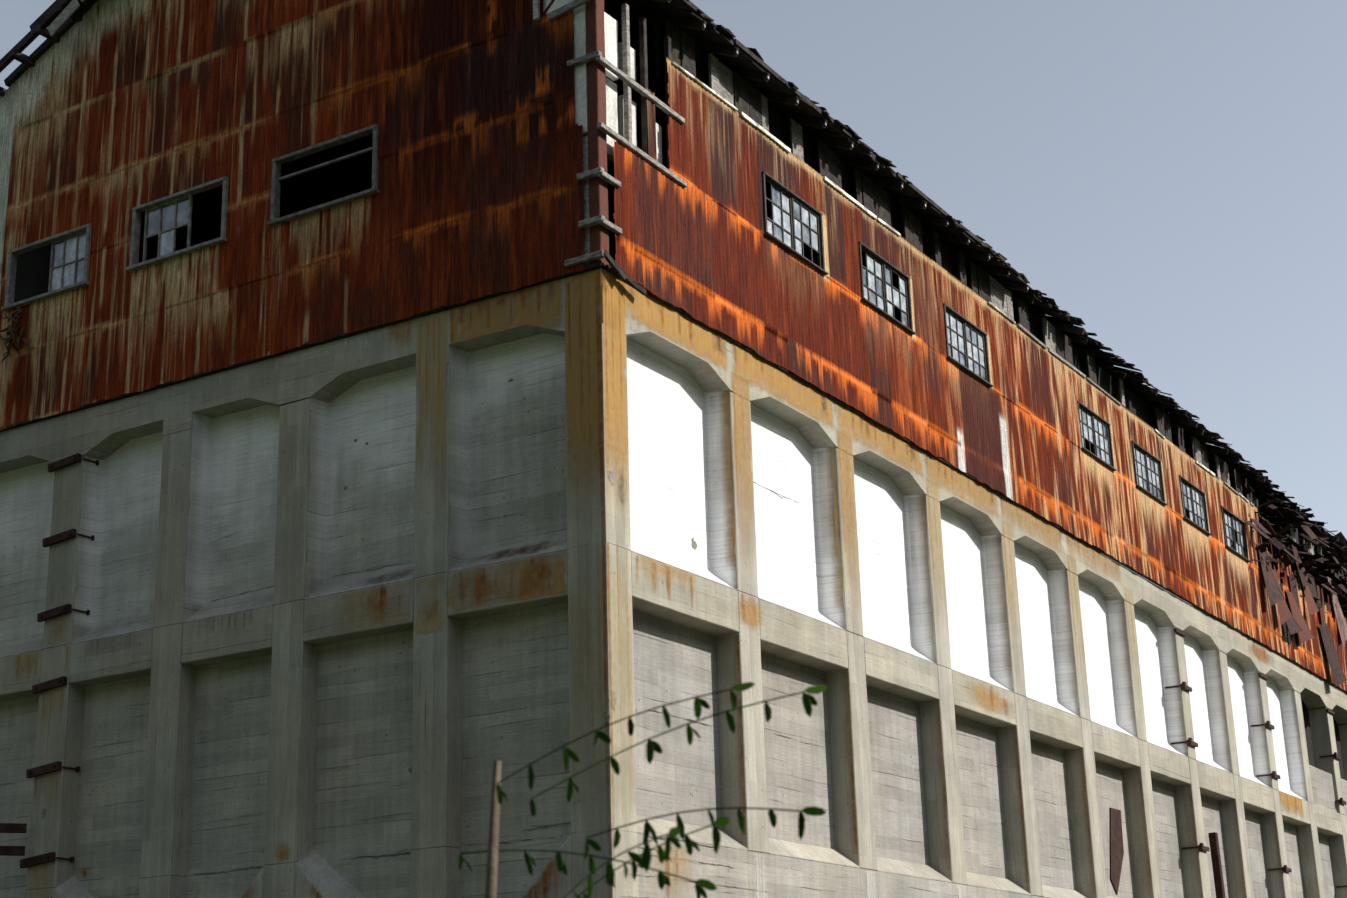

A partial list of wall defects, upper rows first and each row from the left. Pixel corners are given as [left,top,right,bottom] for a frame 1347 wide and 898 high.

rust [417,269,1061,600]